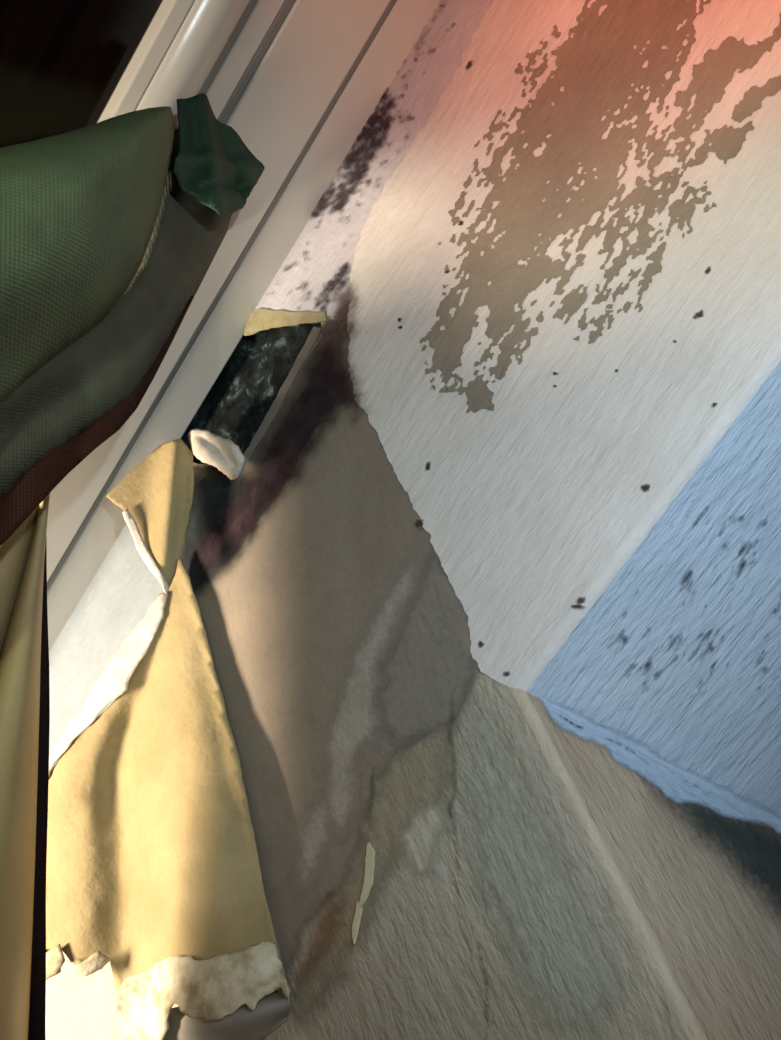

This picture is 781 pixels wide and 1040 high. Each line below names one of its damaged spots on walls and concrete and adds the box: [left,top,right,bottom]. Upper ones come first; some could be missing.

water stain [311,89,411,218]
peeling [420,0,781,413]
water stain [180,263,359,592]
flaking render [181,306,484,1020]
water stain [659,789,781,913]